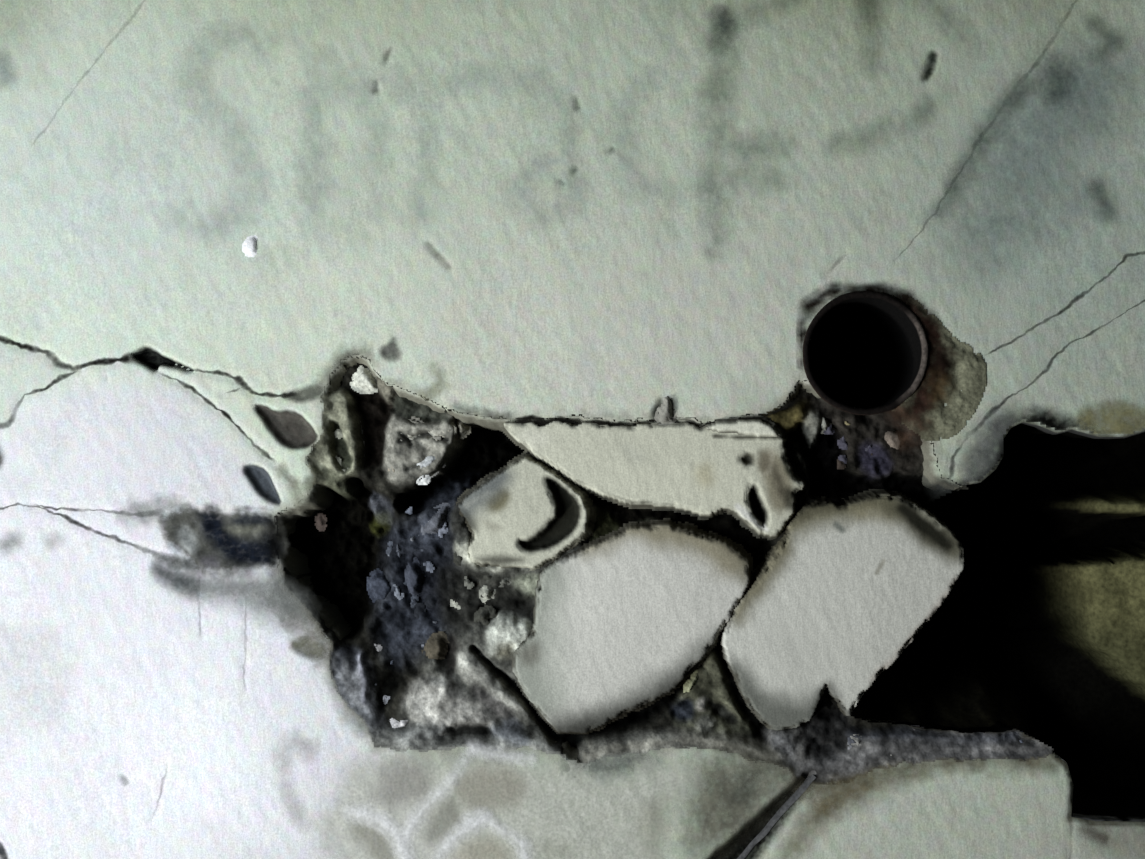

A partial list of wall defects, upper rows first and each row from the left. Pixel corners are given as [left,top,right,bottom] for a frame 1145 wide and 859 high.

crack [1058,294,1083,315]
crack [0,336,130,394]
crack [168,370,294,459]
corrosion [796,285,951,441]
crack [984,395,1012,419]
spalling [133,339,1054,859]